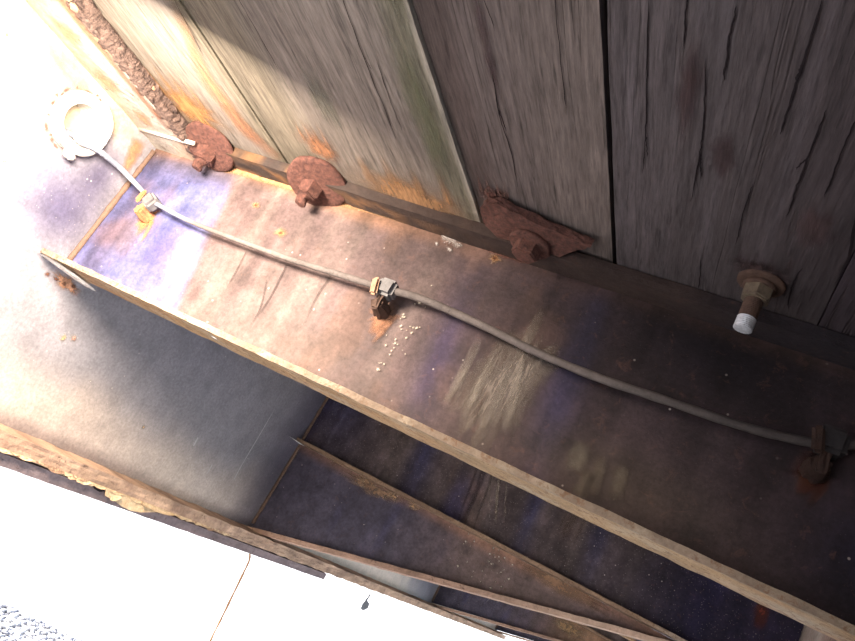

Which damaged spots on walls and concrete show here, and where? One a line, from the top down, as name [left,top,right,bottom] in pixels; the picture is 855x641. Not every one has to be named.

corrosion [0,0,212,158]
corrosion [125,140,142,169]
crack [485,54,518,184]
crack [555,0,567,115]
crack [641,3,649,171]
crack [681,0,689,44]
crack [690,7,736,201]
crack [780,0,822,134]
crack [786,110,826,218]
crack [824,121,855,197]
crack [835,219,855,283]
corrosion [374,304,395,336]